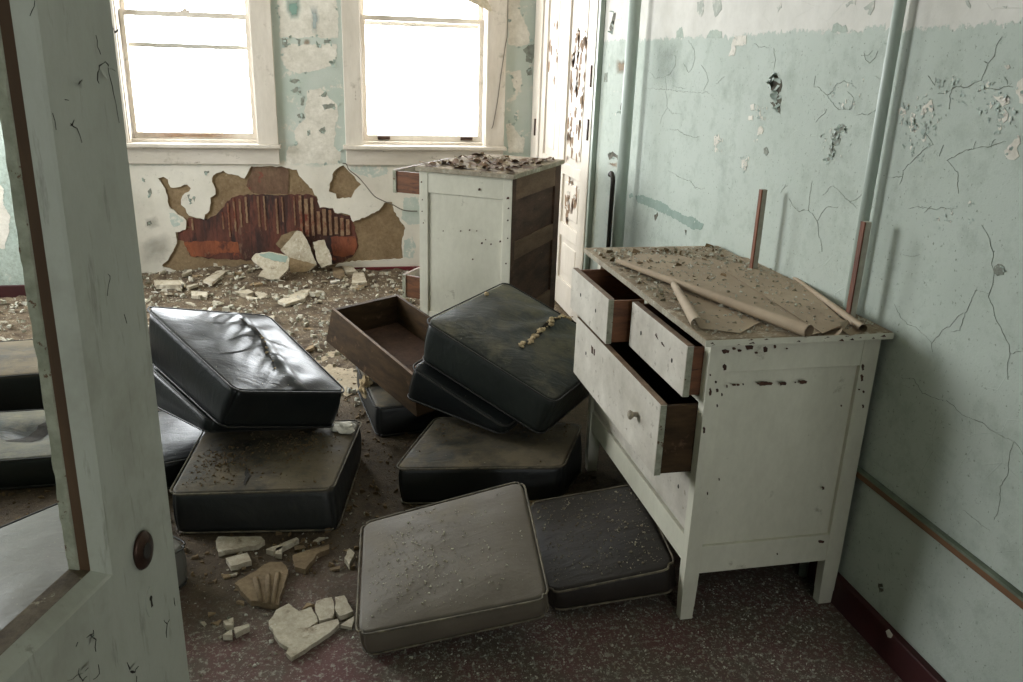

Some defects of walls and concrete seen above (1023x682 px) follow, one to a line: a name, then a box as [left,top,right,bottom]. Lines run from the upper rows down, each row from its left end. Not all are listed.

flaking render [142,0,405,271]
peeling [419,20,588,173]
peeling [565,177,577,224]
peeling [748,73,782,156]
crack [781,184,862,245]
peeling [820,124,850,164]
crack [814,76,874,122]
crack [887,126,1006,212]
peeling [898,76,1023,162]
crack [928,37,1011,107]
crack [894,226,1021,375]
crack [901,377,1023,530]